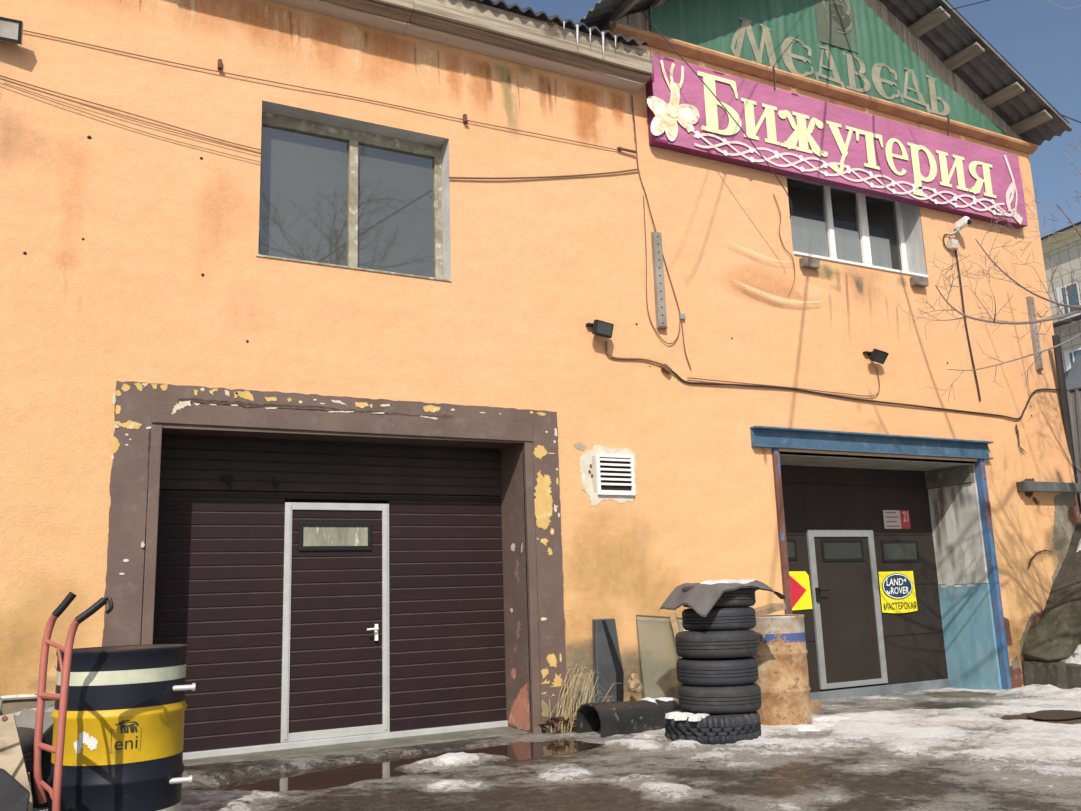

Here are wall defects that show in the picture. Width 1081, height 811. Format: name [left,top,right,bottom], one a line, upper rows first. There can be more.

water stain [501,68,515,117]
peeling [111,382,168,460]
peeling [171,388,390,415]
peeling [421,405,455,420]
peeling [533,428,560,555]
peeling [574,441,637,506]
peeling [511,543,523,585]
flaking render [508,653,563,731]